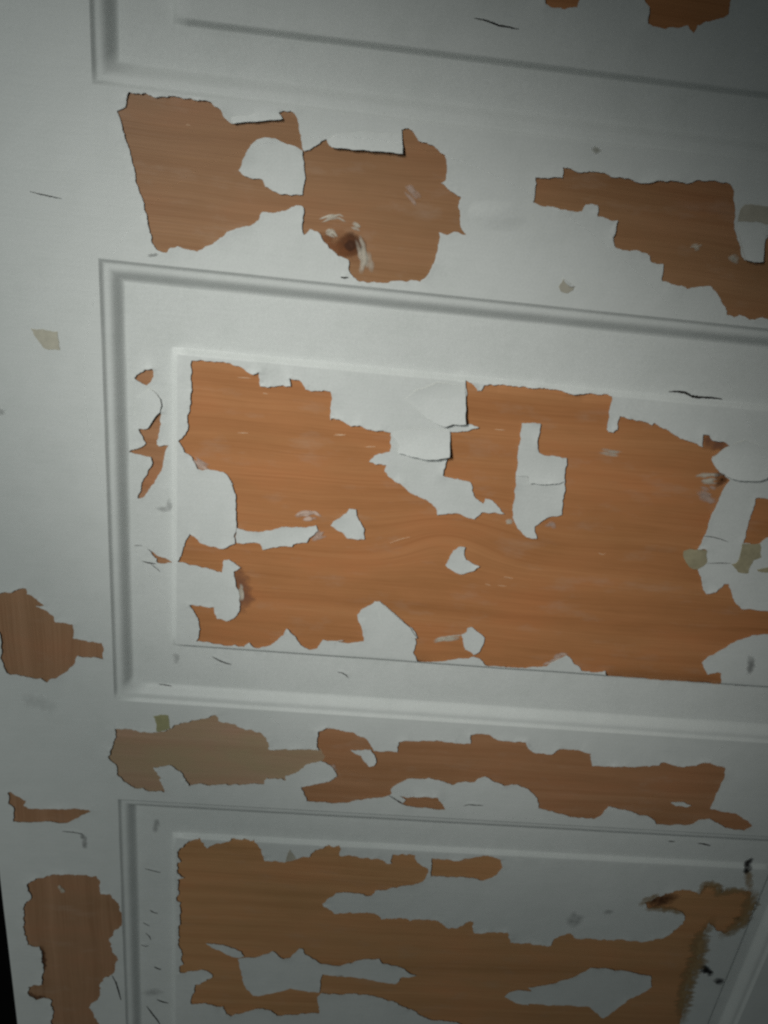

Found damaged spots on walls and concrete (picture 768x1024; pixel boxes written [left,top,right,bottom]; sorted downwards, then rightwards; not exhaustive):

peeling [645,0,731,33]
peeling [117,92,466,283]
peeling [533,168,768,320]
peeling [129,360,768,684]
peeling [0,588,104,682]
peeling [8,792,90,823]
peeling [108,715,752,830]
peeling [23,874,122,1024]
peeling [176,838,757,1024]